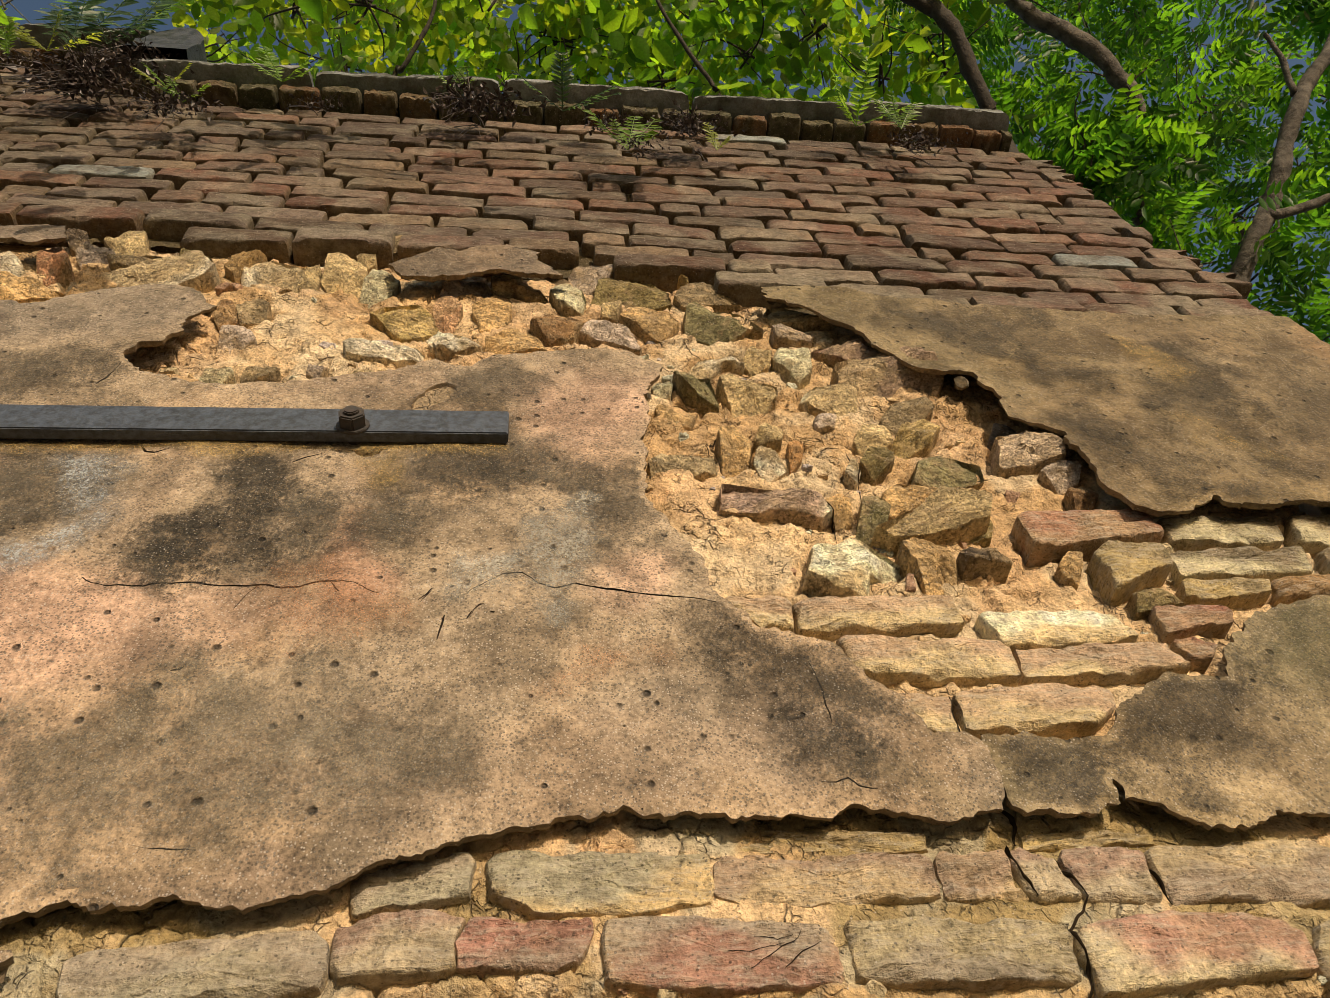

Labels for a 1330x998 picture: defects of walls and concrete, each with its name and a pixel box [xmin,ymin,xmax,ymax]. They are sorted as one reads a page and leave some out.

water stain [115,358,658,625]
flaking render [0,226,1330,741]
flaking render [0,778,1330,998]
crack [1001,810,1093,998]